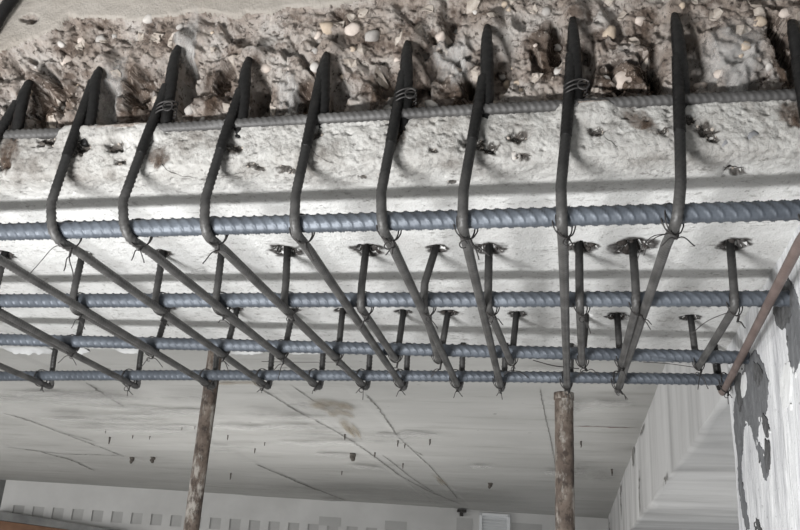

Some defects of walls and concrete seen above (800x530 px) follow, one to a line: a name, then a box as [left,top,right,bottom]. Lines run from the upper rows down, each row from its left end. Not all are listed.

spalling [0,0,800,147]
crack [4,413,124,471]
crack [251,380,461,505]